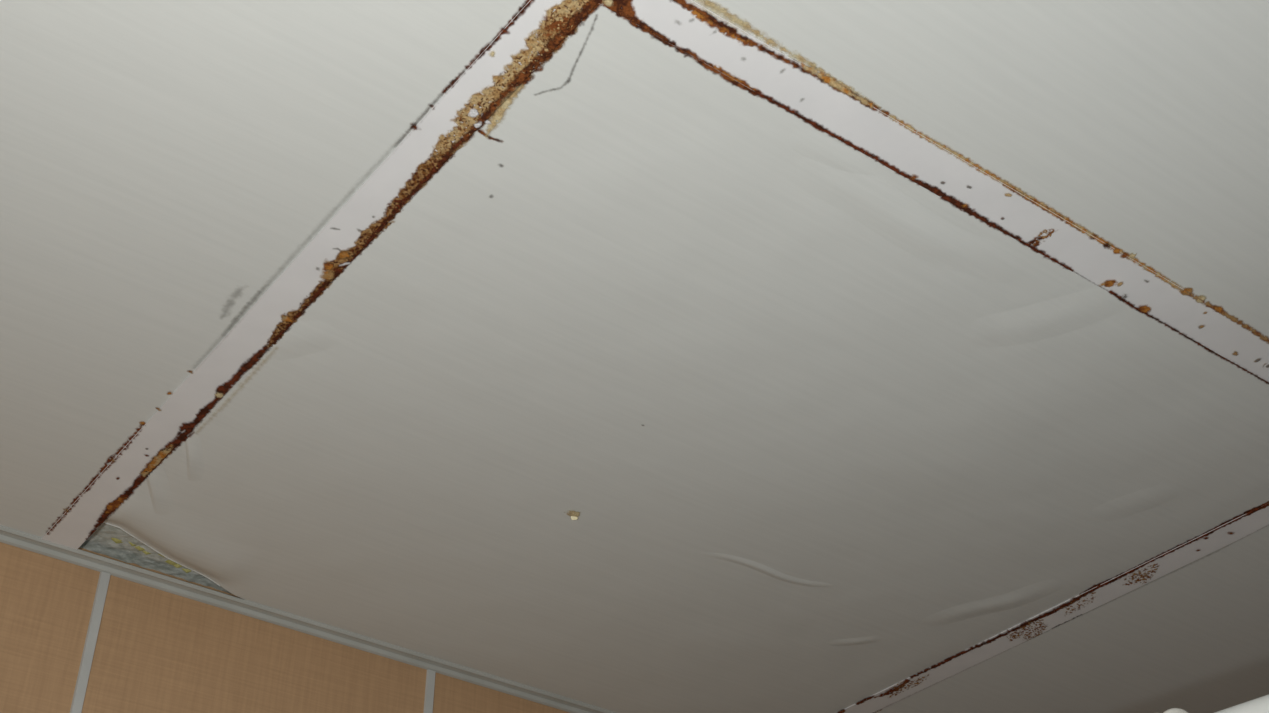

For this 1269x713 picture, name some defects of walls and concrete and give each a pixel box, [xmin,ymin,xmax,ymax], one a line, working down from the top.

corrosion [47,0,1269,540]
peeling [79,522,232,594]
corrosion [837,501,1269,713]